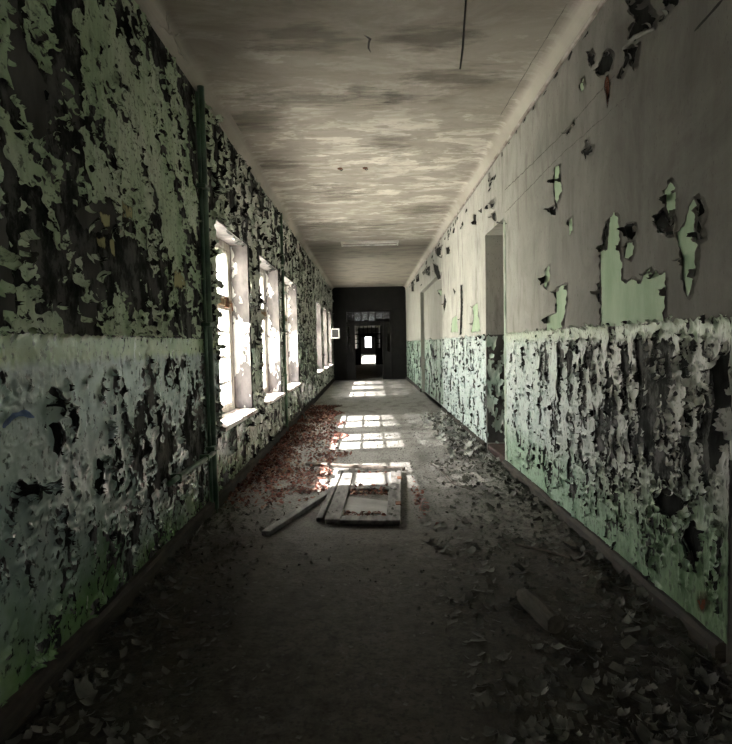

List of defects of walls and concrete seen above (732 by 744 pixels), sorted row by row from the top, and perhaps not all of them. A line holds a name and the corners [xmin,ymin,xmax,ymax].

peeling [579,0,683,94]
peeling [0,0,334,707]
peeling [406,163,732,644]